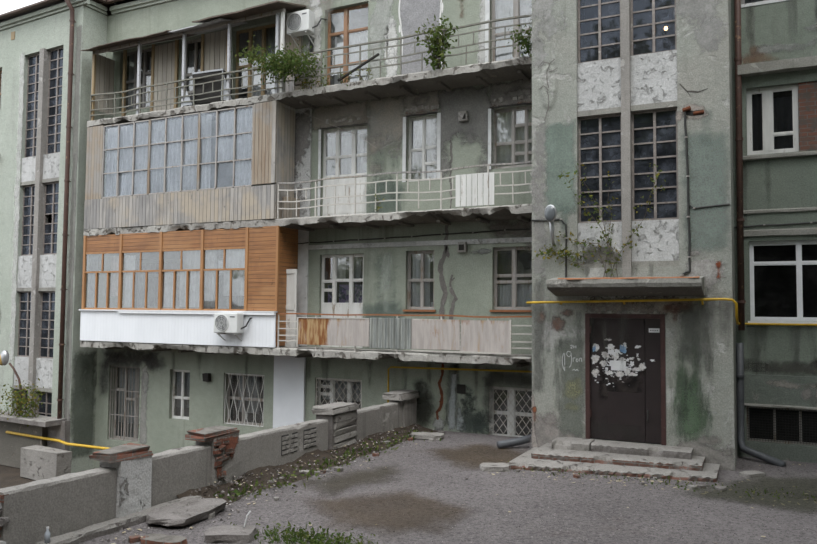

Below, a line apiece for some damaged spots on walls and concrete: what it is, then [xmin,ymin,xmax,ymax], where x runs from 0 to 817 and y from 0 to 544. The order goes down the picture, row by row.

peeling [368,0,401,80]
peeling [477,0,485,63]
peeling [530,0,566,67]
peeling [294,78,532,200]
crack [437,134,458,320]